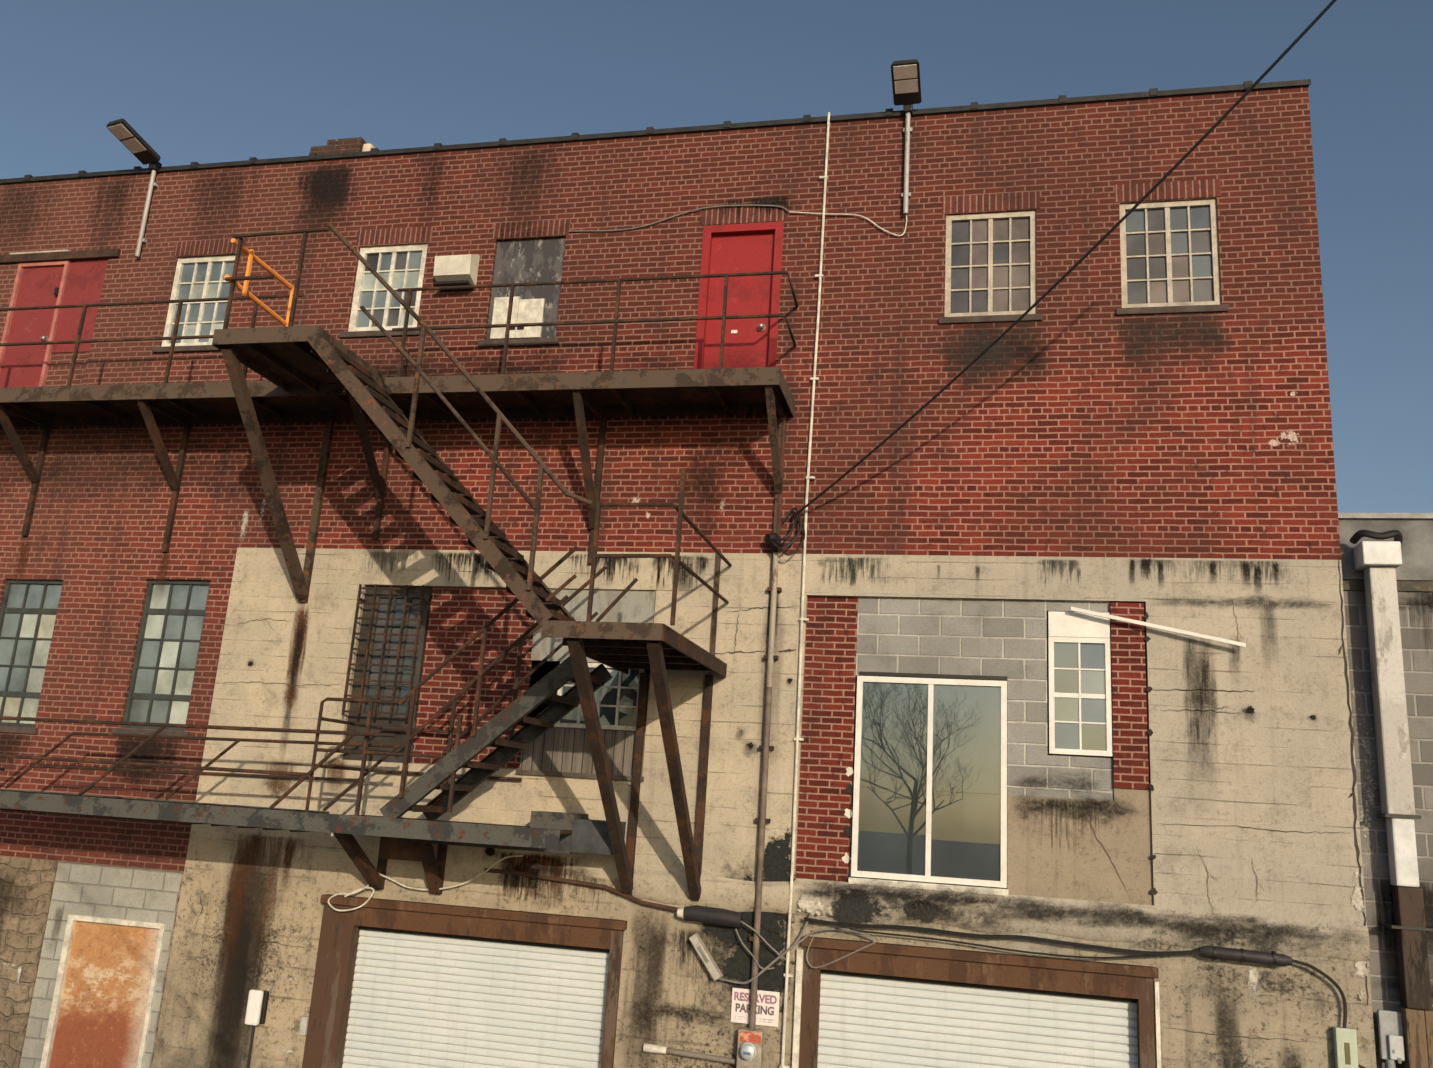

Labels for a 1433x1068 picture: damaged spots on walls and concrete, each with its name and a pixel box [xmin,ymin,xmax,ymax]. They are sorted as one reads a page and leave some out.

water stain [299,167,350,216]
water stain [1042,560,1080,583]
water stain [1130,559,1172,581]
water stain [1174,561,1311,607]
water stain [1027,782,1127,818]
corrosion [283,839,295,876]
water stain [809,880,1347,1068]